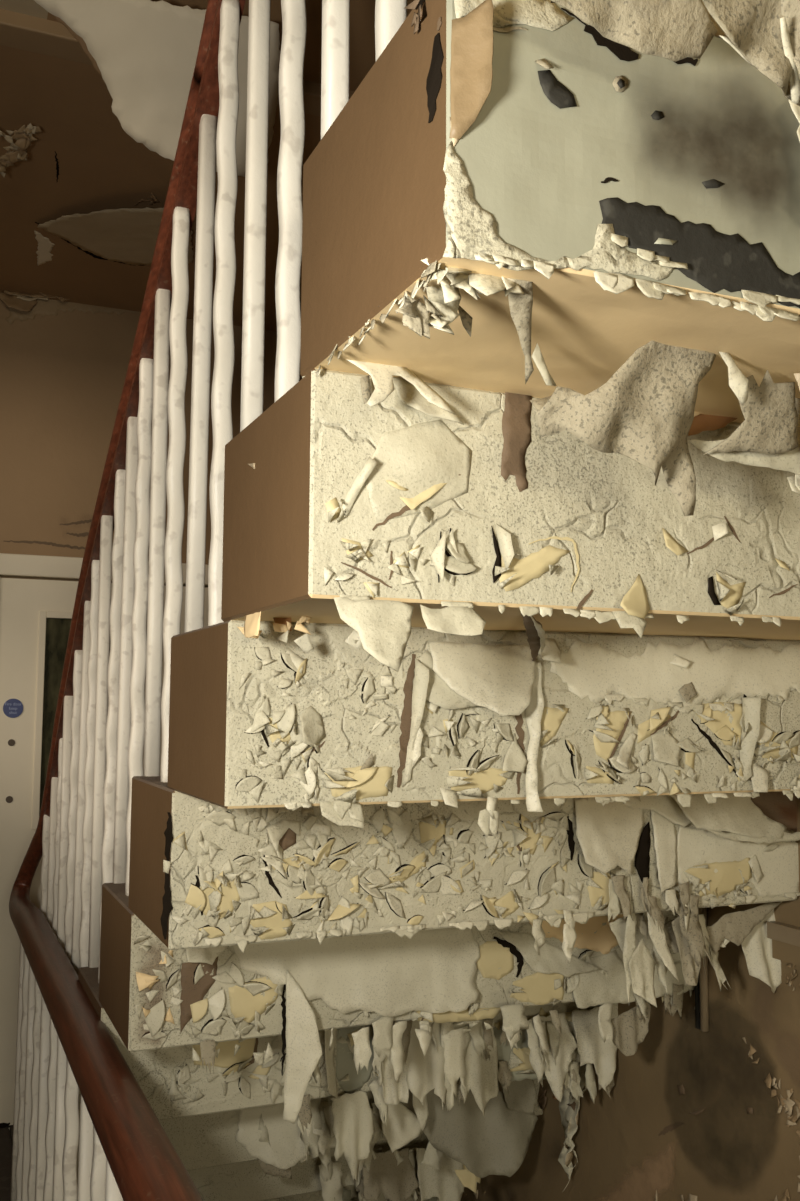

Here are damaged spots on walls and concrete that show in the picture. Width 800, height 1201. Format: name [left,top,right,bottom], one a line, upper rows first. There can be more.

peeling [0,123,42,177]
peeling [34,192,164,266]
peeling [34,0,206,161]
peeling [236,16,249,177]
peeling [268,21,281,162]
leakage [653,111,789,207]
peeling [134,480,800,1201]